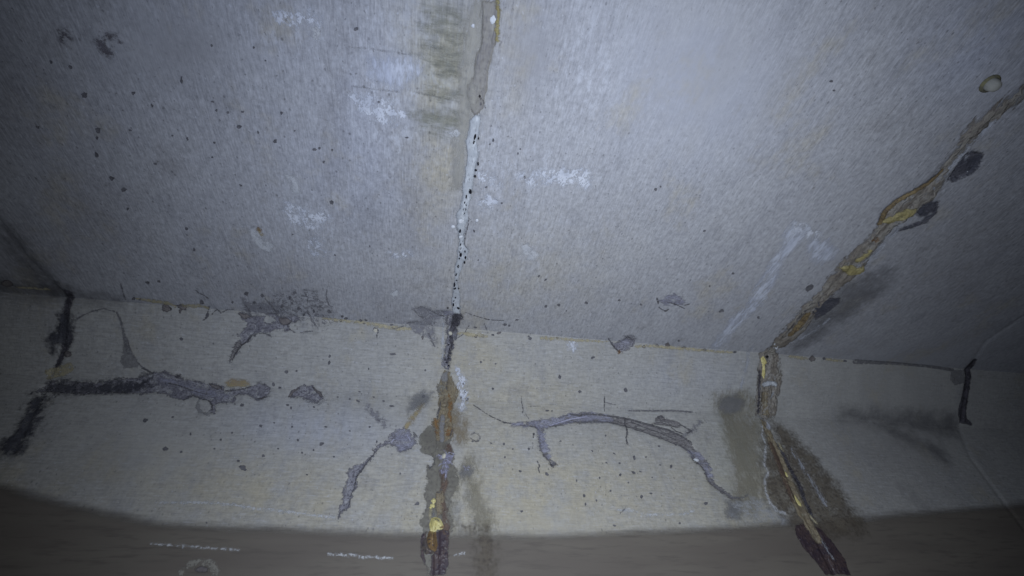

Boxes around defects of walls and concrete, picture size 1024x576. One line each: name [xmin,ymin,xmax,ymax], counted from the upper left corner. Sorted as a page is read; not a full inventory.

crack [46,285,155,376]
spalling [229,291,325,363]
water stain [718,84,1024,518]
crack [0,392,50,455]
spalling [288,384,323,404]
rust [431,370,467,443]
crack [475,396,540,473]
crack [853,359,977,426]
crack [338,428,417,519]
water stain [0,425,1024,576]